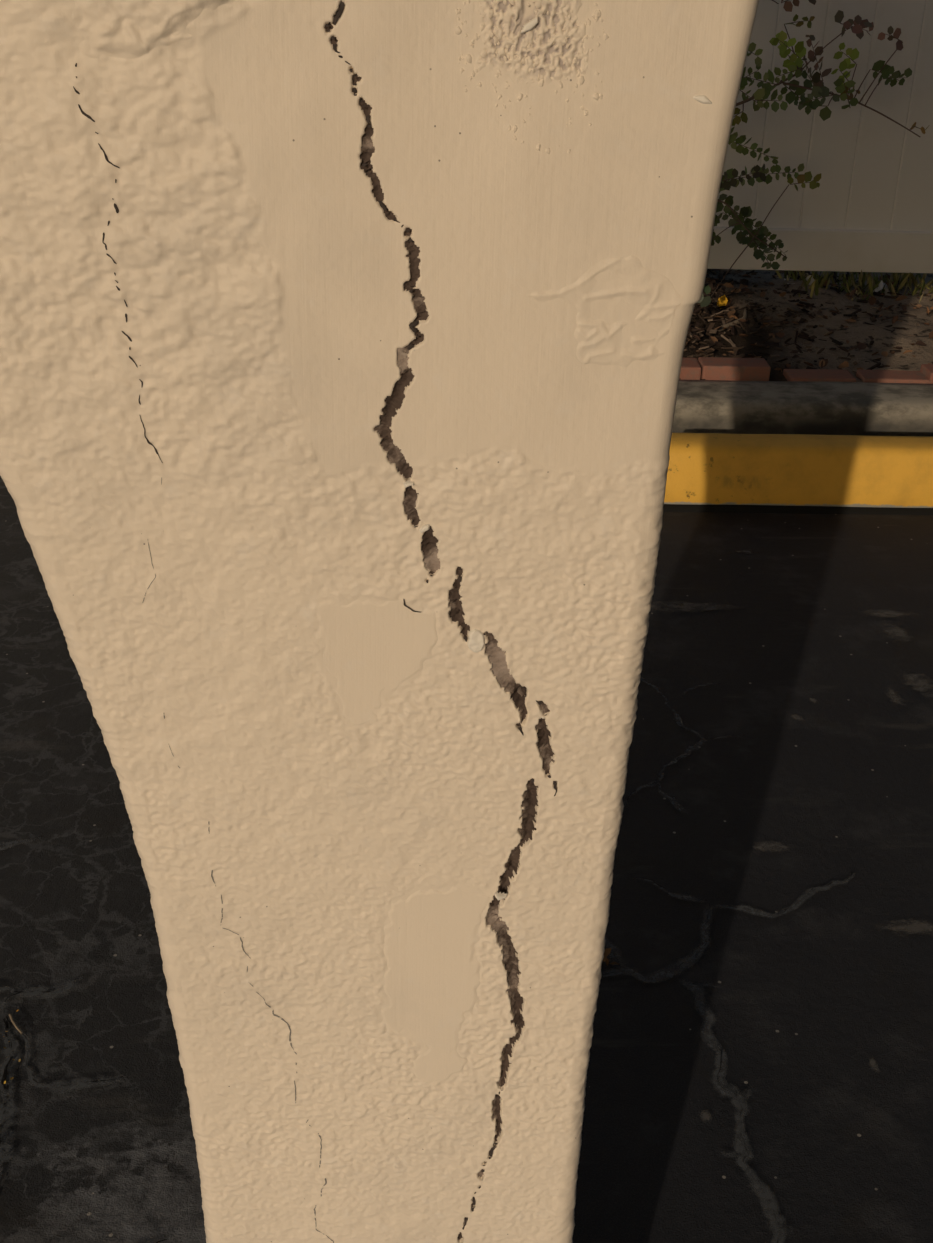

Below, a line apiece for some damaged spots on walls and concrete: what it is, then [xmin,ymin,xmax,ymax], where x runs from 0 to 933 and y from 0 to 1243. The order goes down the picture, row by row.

crack [324,1,557,1240]
peeling [455,0,609,154]